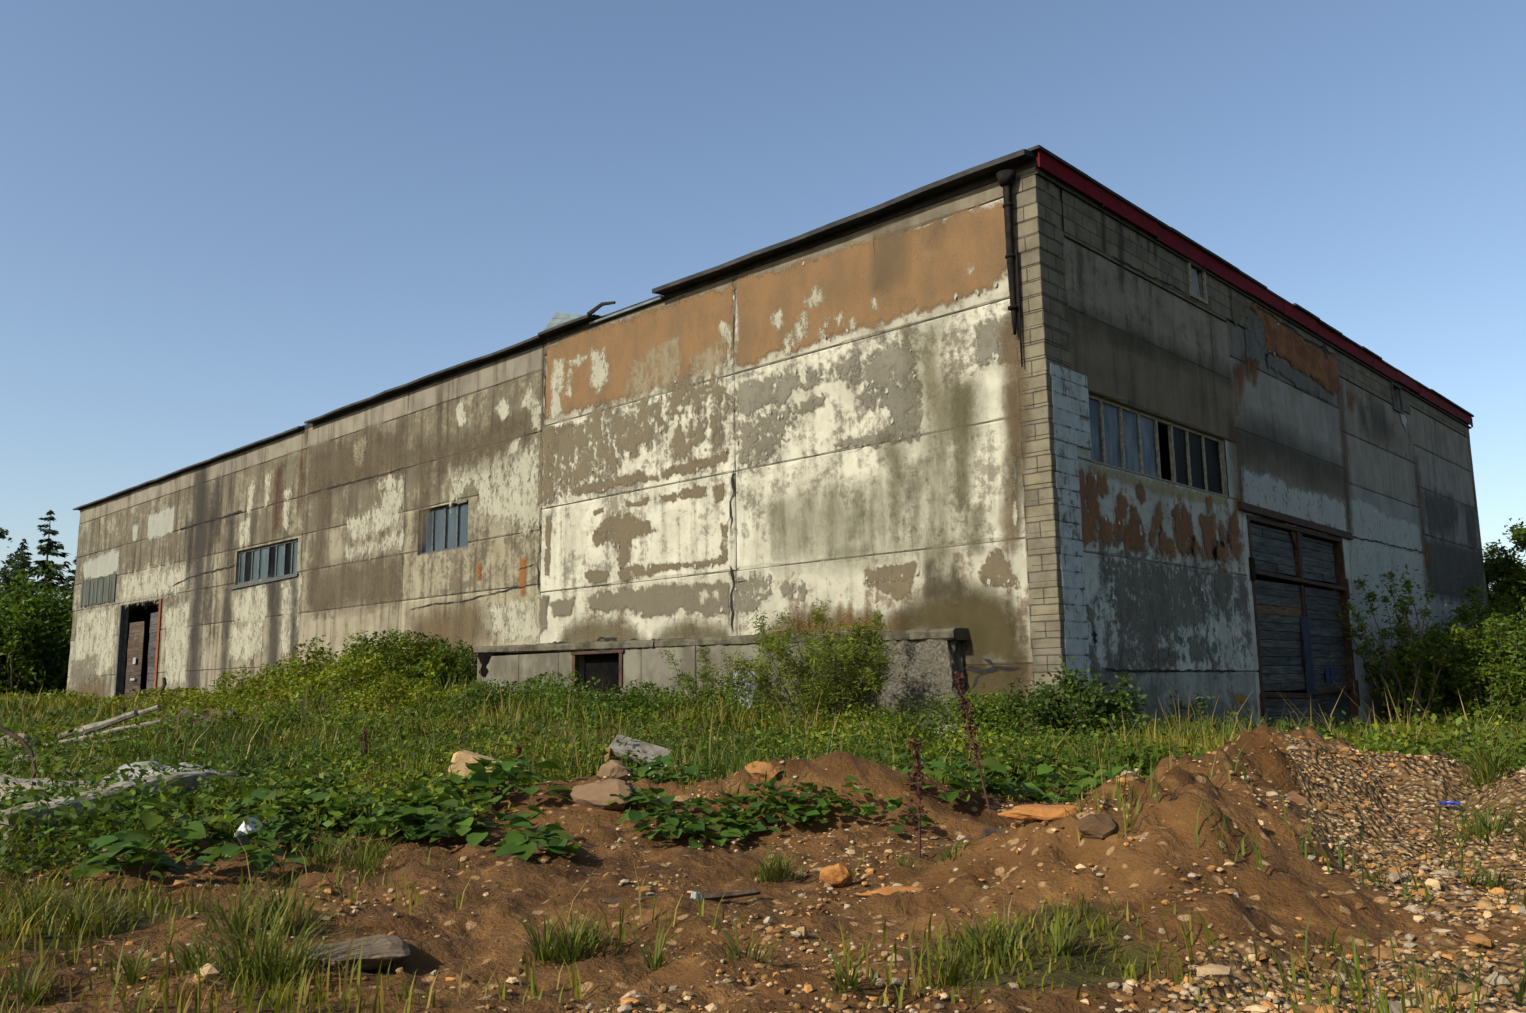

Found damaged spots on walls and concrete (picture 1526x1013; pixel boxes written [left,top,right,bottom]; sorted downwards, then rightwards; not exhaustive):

leakage [69,653,105,701]
leakage [187,468,234,694]
peeling [344,474,404,562]
peeling [456,399,466,427]
peeling [495,397,509,420]
peeling [508,202,1019,633]
leakage [887,318,1027,717]
peeling [1079,466,1244,674]